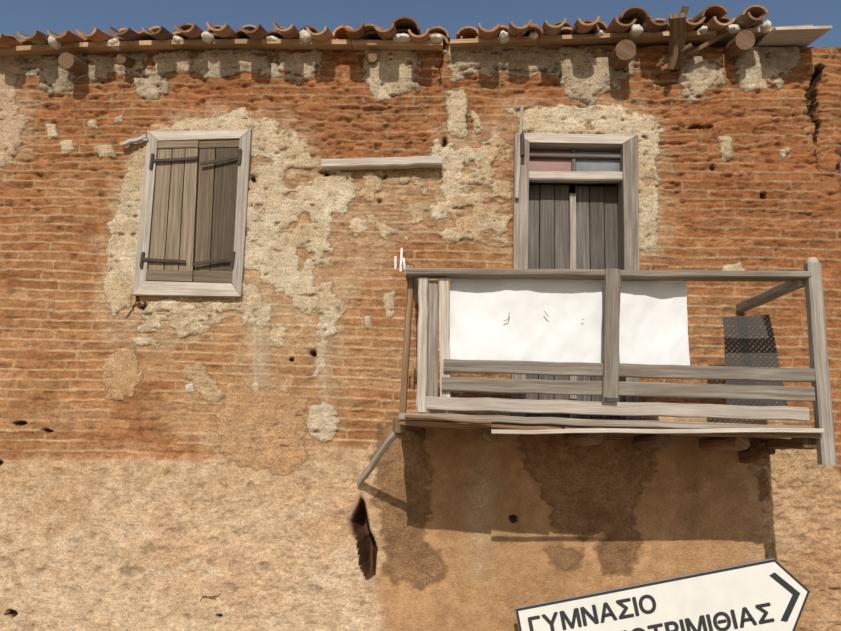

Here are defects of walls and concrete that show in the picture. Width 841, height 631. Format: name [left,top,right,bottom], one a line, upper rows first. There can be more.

peeling [677,47,801,103]
peeling [0,48,323,167]
crack [805,63,824,172]
spalling [718,135,733,162]
peeling [103,45,665,377]
spalling [721,262,745,271]
peeling [182,361,223,404]
peeling [752,449,826,501]
spalling [352,422,448,590]